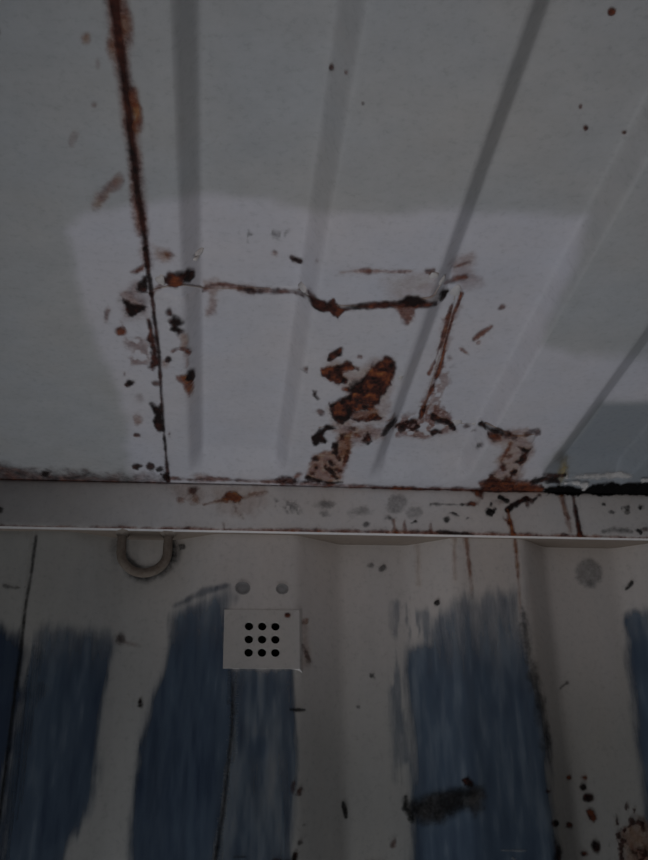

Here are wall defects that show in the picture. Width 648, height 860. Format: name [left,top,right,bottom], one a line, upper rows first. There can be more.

rust [0,0,197,494]
rust [203,264,648,574]
peeling [564,472,630,491]
rust [616,804,648,860]